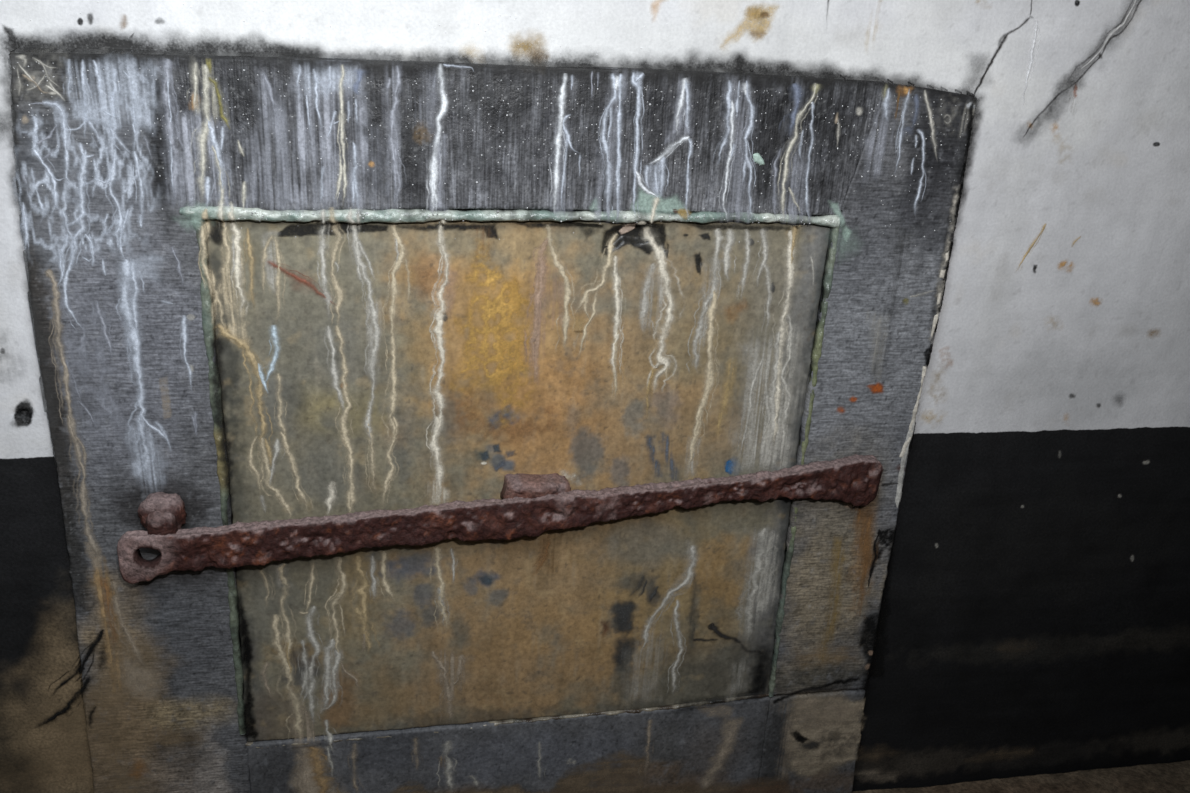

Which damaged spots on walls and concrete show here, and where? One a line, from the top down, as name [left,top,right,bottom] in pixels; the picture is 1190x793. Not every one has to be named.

rust [731,7,773,38]
crack [1026,0,1141,133]
crack [925,2,1032,366]
water stain [0,27,981,567]
crack [882,422,916,486]
water stain [236,551,392,793]
water stain [430,547,455,621]
rust [94,454,883,689]
water stain [643,546,696,687]
water stain [746,528,775,632]
water stain [437,743,457,787]
water stain [701,707,741,790]